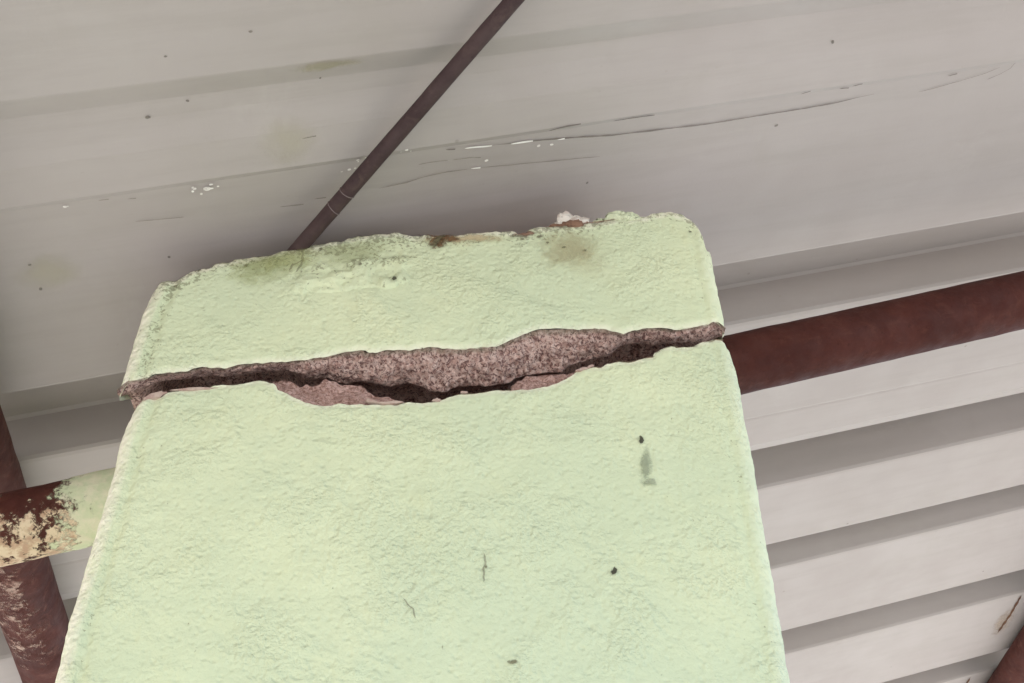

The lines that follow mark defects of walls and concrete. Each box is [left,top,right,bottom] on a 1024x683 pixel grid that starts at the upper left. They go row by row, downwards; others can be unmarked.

crack [117,322,726,410]